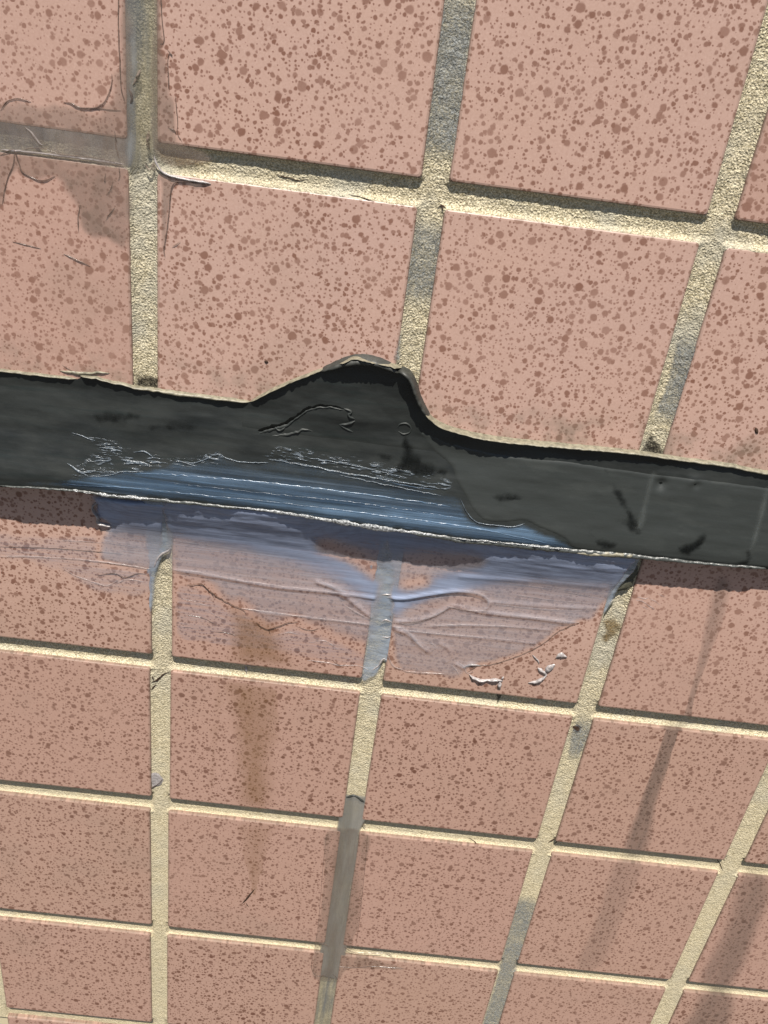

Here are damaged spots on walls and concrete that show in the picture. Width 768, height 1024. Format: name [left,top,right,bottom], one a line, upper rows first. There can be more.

peeling [469,674,504,689]
peeling [528,653,567,684]